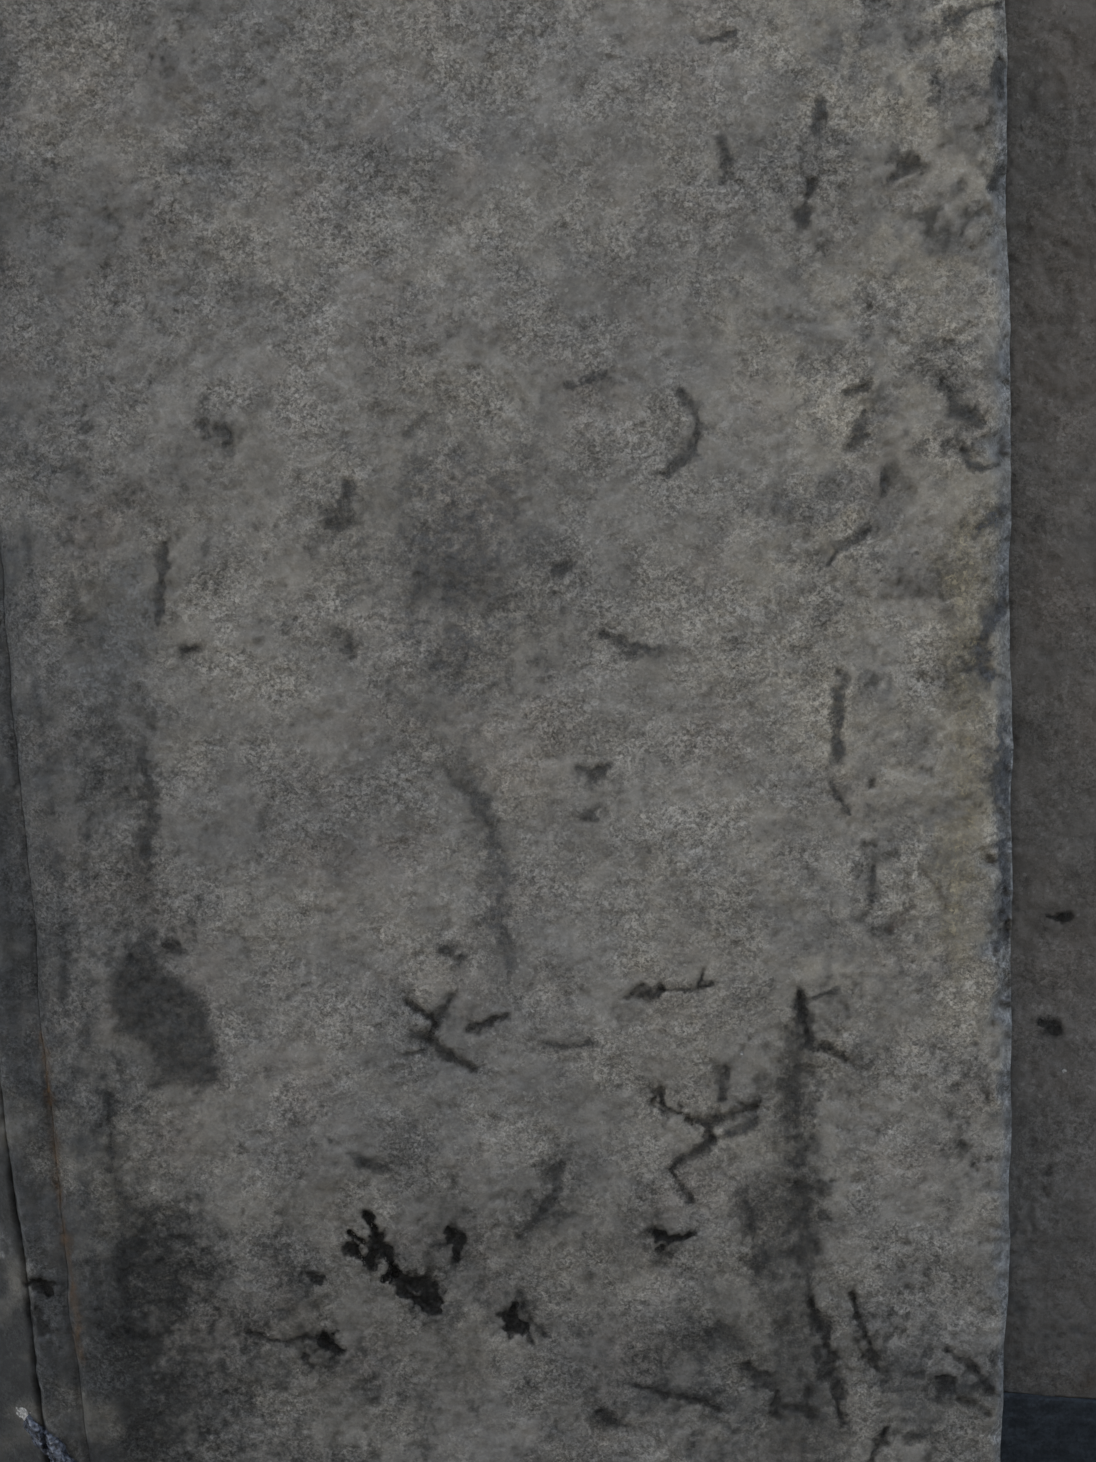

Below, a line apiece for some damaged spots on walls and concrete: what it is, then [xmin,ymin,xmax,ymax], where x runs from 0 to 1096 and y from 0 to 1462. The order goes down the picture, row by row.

crack [699,30,737,44]
crack [661,389,703,479]
water stain [112,934,220,1088]
crack [405,994,508,1073]
crack [651,1066,759,1204]
water stain [741,991,842,1462]